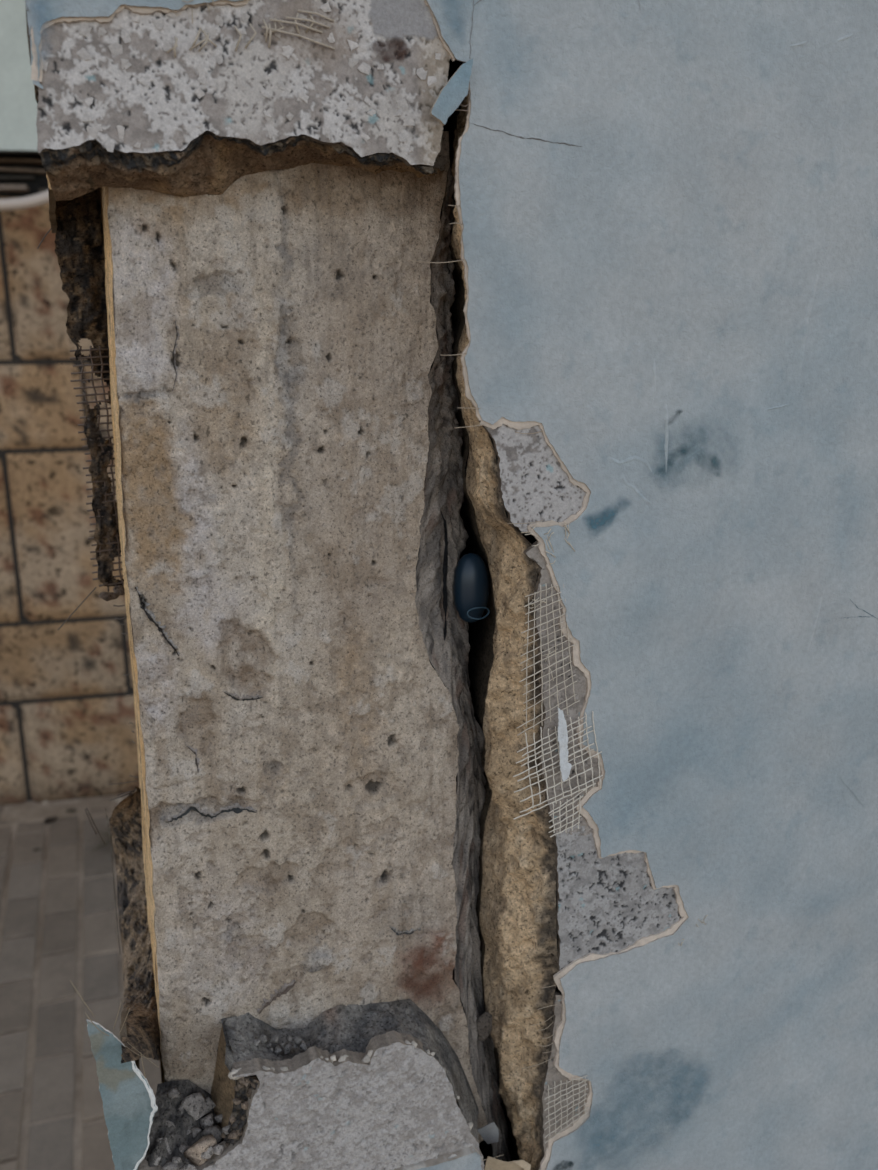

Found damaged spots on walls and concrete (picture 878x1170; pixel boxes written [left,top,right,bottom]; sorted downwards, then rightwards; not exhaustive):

peeling [29,0,473,635]
crack [188,746,200,773]
crack [168,803,257,822]
spalling [70,775,484,1170]
crack [408,88,582,1170]
spalling [479,417,707,1170]
damp [588,510,617,530]